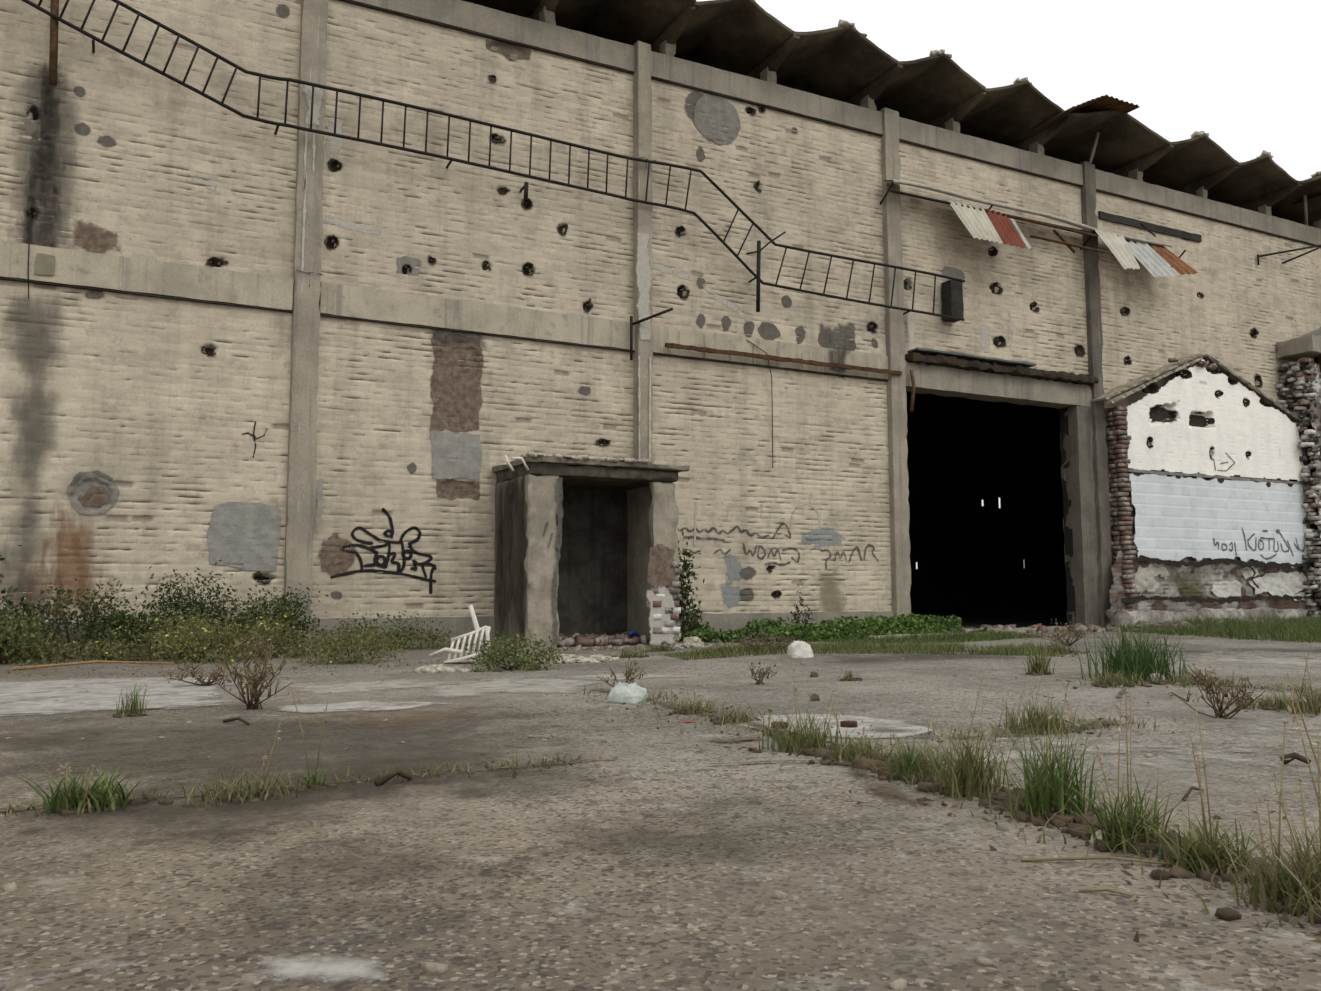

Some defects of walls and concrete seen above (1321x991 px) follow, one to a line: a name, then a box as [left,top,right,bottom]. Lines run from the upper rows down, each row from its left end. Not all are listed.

water stain [22,65,73,247]
water stain [11,302,53,474]
peeling [430,329,484,433]
peeling [436,479,480,500]
spalling [1104,383,1215,611]
water stain [13,507,36,599]
flaking render [1211,568,1308,601]